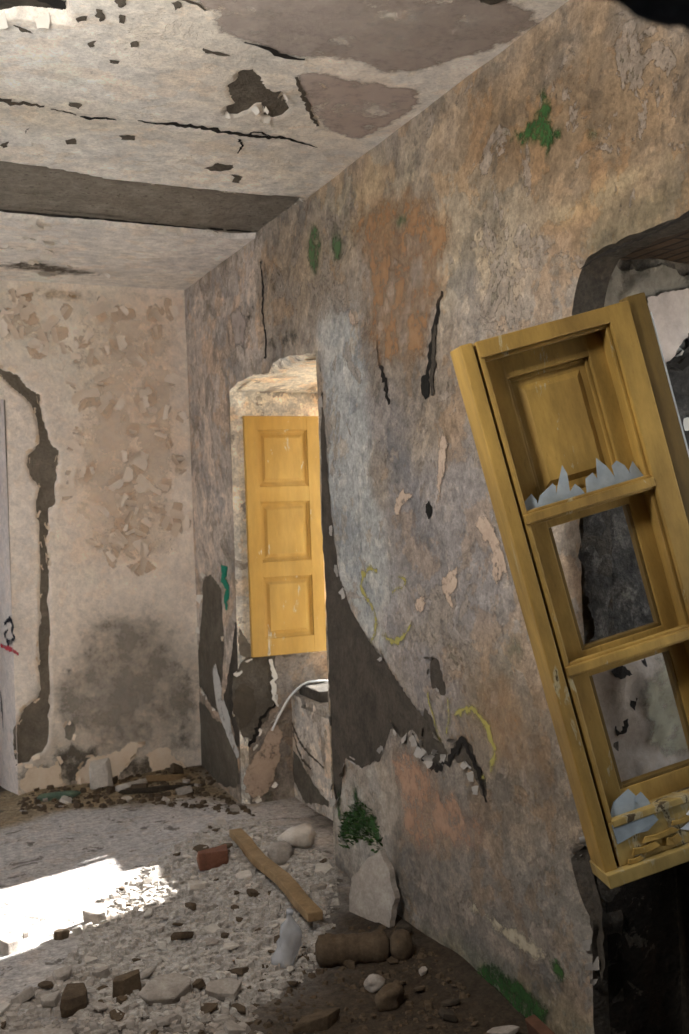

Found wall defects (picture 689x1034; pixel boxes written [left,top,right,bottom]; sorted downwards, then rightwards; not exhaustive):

crack [0,98,318,153]
flaking render [224,69,289,124]
flaking render [0,161,303,246]
crack [580,211,689,269]
peeling [604,264,689,456]
peeling [0,259,191,575]
flaking render [195,392,487,807]
leakage [60,623,195,739]
peeling [592,653,689,782]
leakage [57,745,96,784]
peeling [19,741,186,793]
leakage [122,757,152,775]